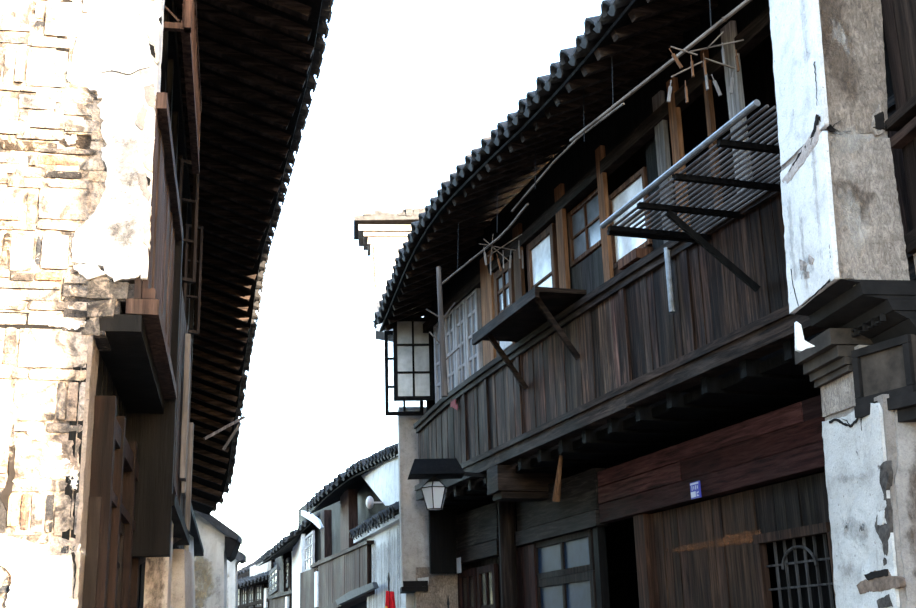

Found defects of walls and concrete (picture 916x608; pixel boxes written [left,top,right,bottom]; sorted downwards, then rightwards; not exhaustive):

crack [95,67,149,75]
flaking render [67,0,162,283]
spalling [782,125,822,184]
peeling [51,319,80,330]
peeling [14,427,78,489]
spalling [856,460,906,608]
flaking render [0,536,81,608]
water stain [194,556,213,608]